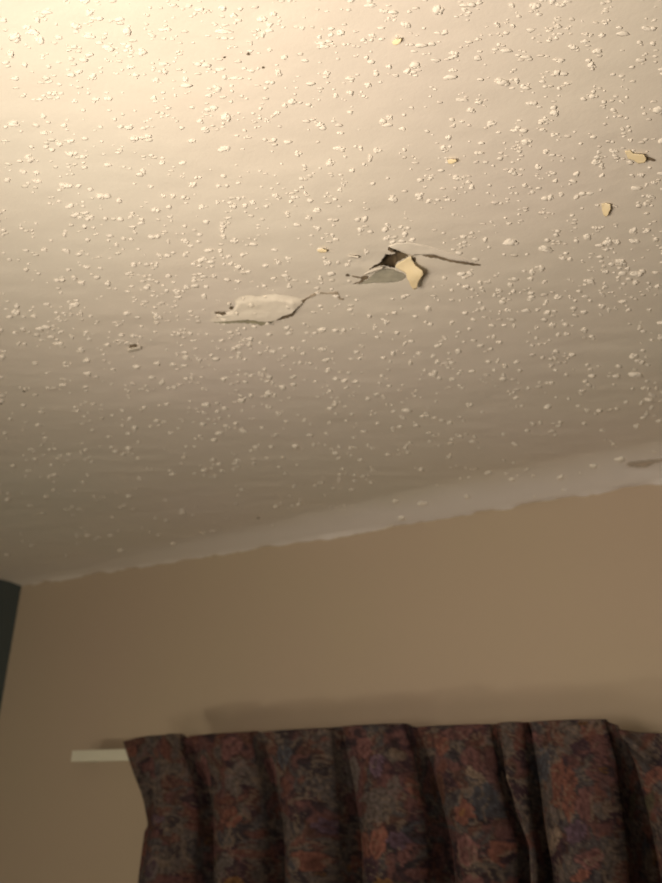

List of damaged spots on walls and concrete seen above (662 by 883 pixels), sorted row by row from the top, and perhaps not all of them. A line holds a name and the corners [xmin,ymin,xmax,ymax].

peeling [361,247,423,290]